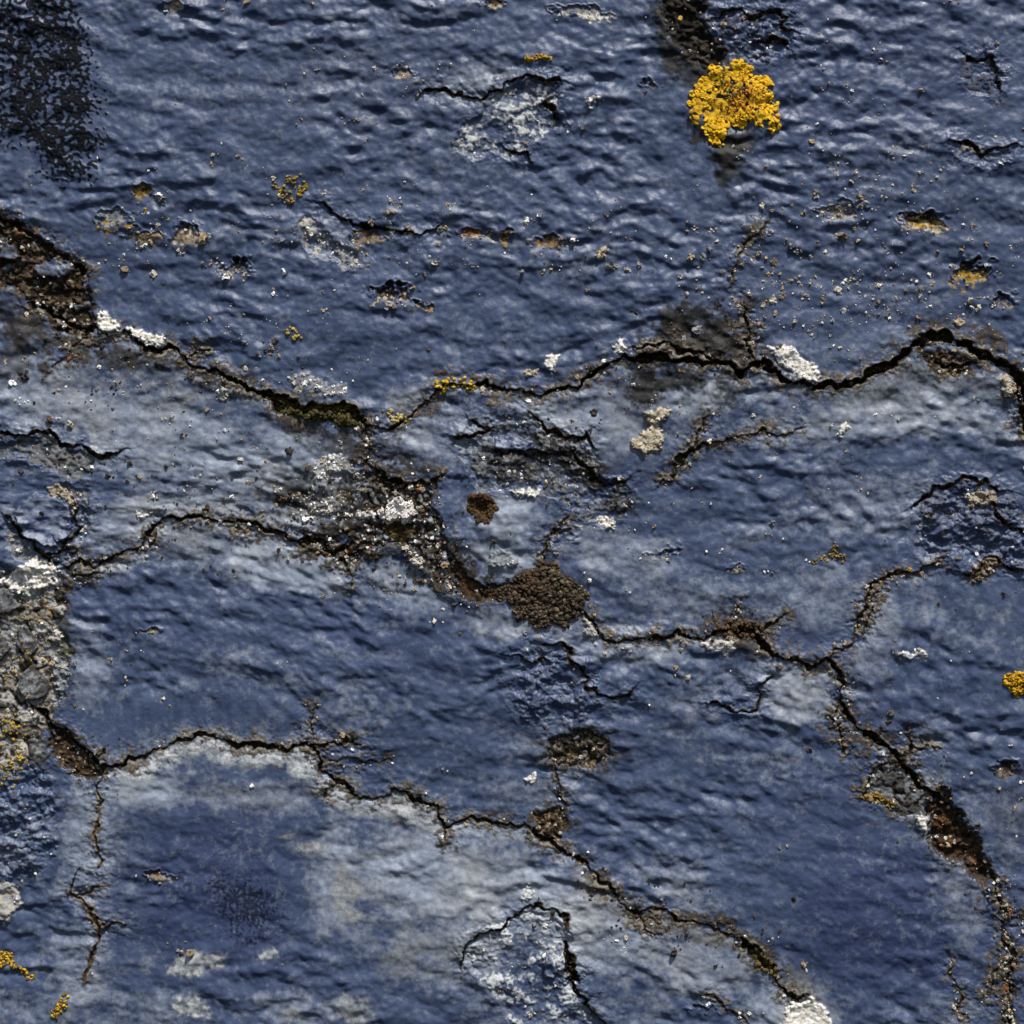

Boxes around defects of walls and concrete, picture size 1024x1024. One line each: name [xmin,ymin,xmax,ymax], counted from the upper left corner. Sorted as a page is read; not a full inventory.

crack [0,205,1024,517]
damp [626,293,821,456]
spalling [0,428,121,795]
crack [62,506,374,596]
crack [532,508,577,564]
crack [582,554,959,817]
crack [28,698,819,1003]
crack [701,991,752,1024]
crack [942,863,1024,1024]